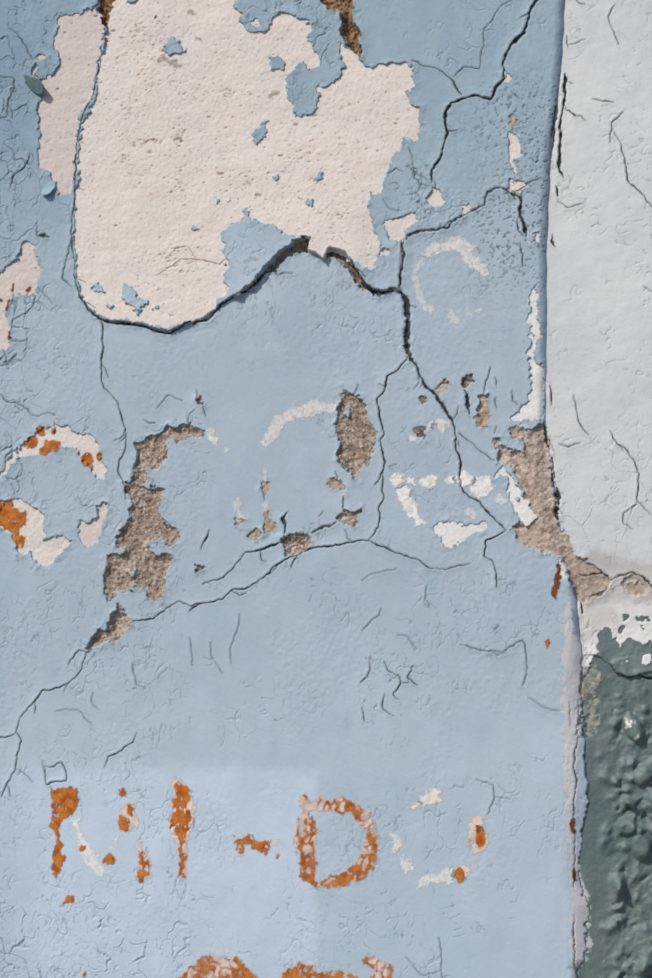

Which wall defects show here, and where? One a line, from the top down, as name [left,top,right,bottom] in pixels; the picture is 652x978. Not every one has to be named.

peeling [24,0,420,328]
crack [390,0,538,188]
peeling [0,241,42,350]
peeling [0,425,107,480]
peeling [0,499,108,566]
flaking render [87,423,205,652]
crack [3,35,293,498]
flaking render [335,390,378,478]
crack [135,74,652,671]
corrosion [551,564,561,598]
crack [362,661,417,721]
crack [462,626,585,885]